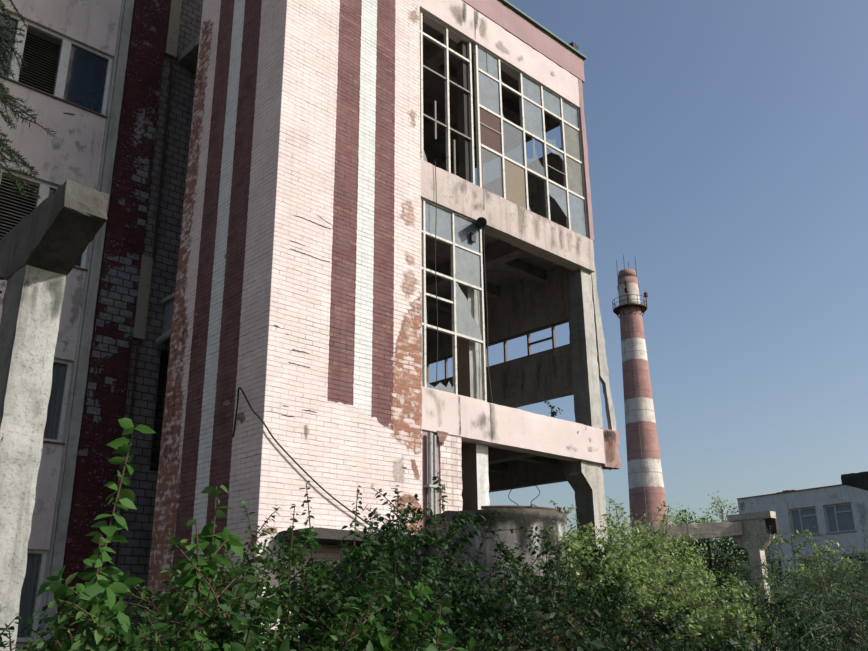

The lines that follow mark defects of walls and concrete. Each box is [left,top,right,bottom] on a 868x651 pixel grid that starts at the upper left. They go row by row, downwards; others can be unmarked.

peeling [125,109,156,239]
peeling [401,202,415,225]
peeling [83,253,141,424]
peeling [144,20,214,623]
peeling [388,254,423,533]